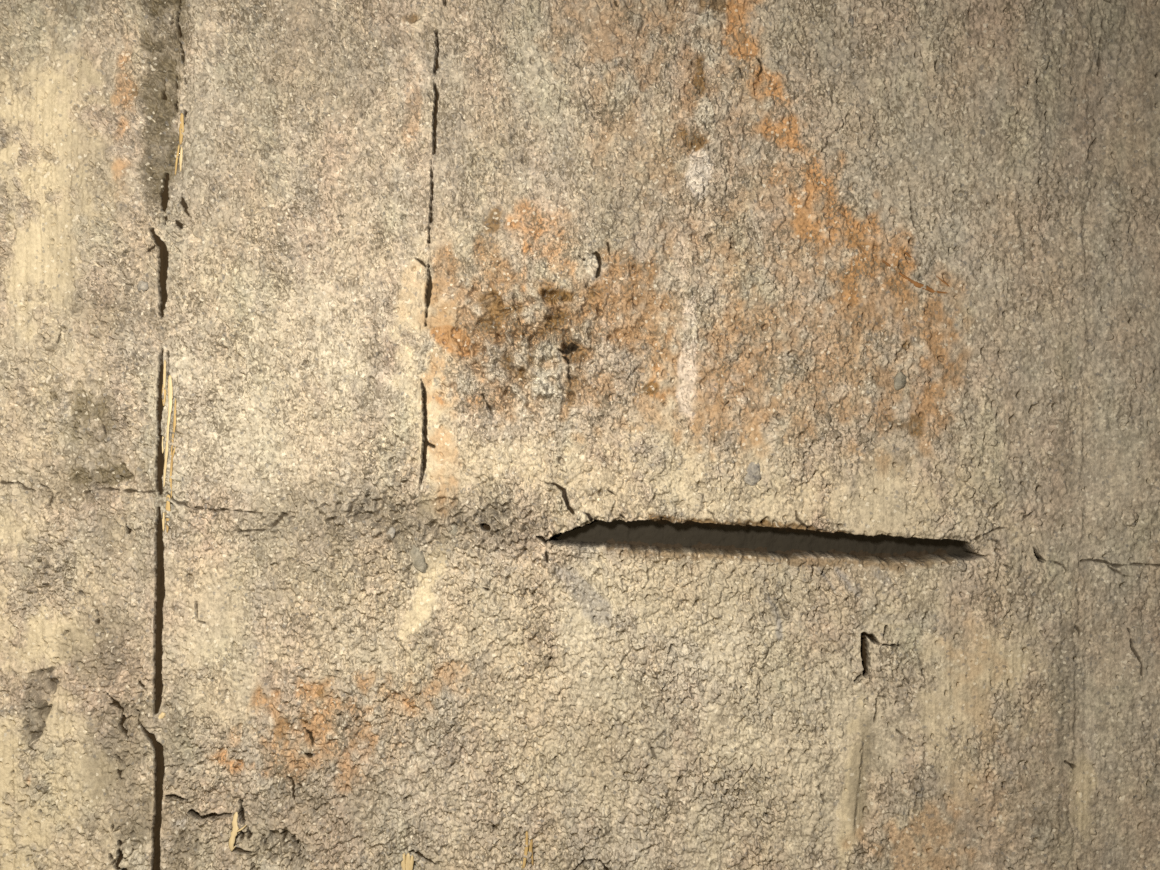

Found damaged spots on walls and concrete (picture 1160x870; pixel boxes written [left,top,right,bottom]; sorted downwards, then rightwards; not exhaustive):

crack [160,0,188,133]
crack [414,0,448,327]
crack [142,172,191,318]
corrosion [394,0,981,500]
crack [55,321,66,347]
crack [0,480,54,508]
crack [419,378,436,491]
crack [794,504,840,527]
crack [84,347,355,870]
corrosion [204,657,473,797]
crack [399,846,437,866]